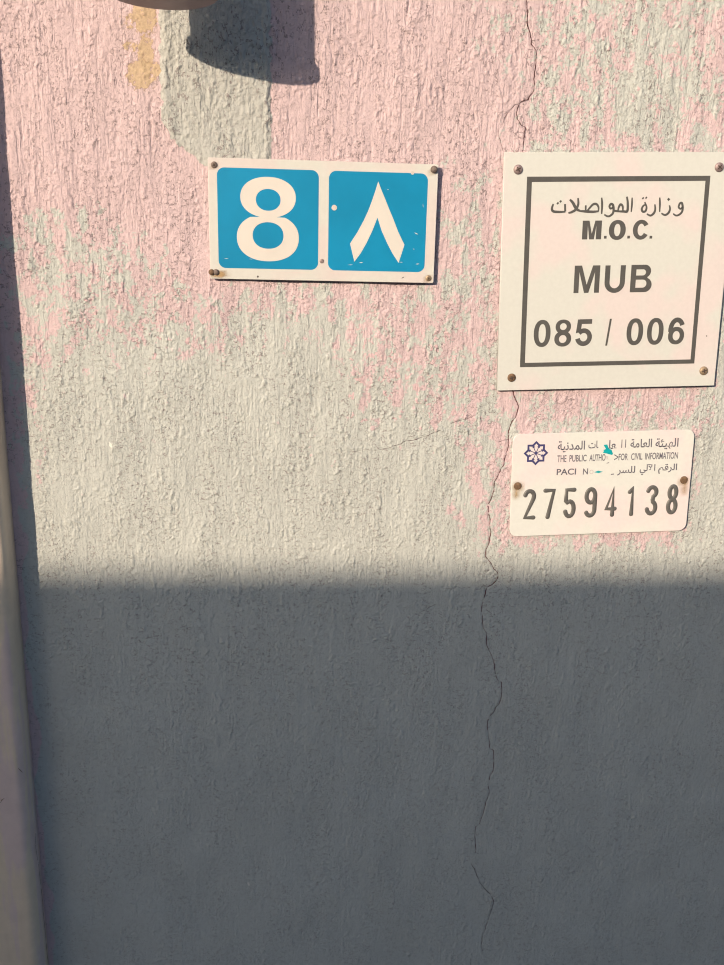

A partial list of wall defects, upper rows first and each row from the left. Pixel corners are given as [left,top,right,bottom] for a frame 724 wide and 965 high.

crack [498,0,539,151]
crack [455,390,519,945]